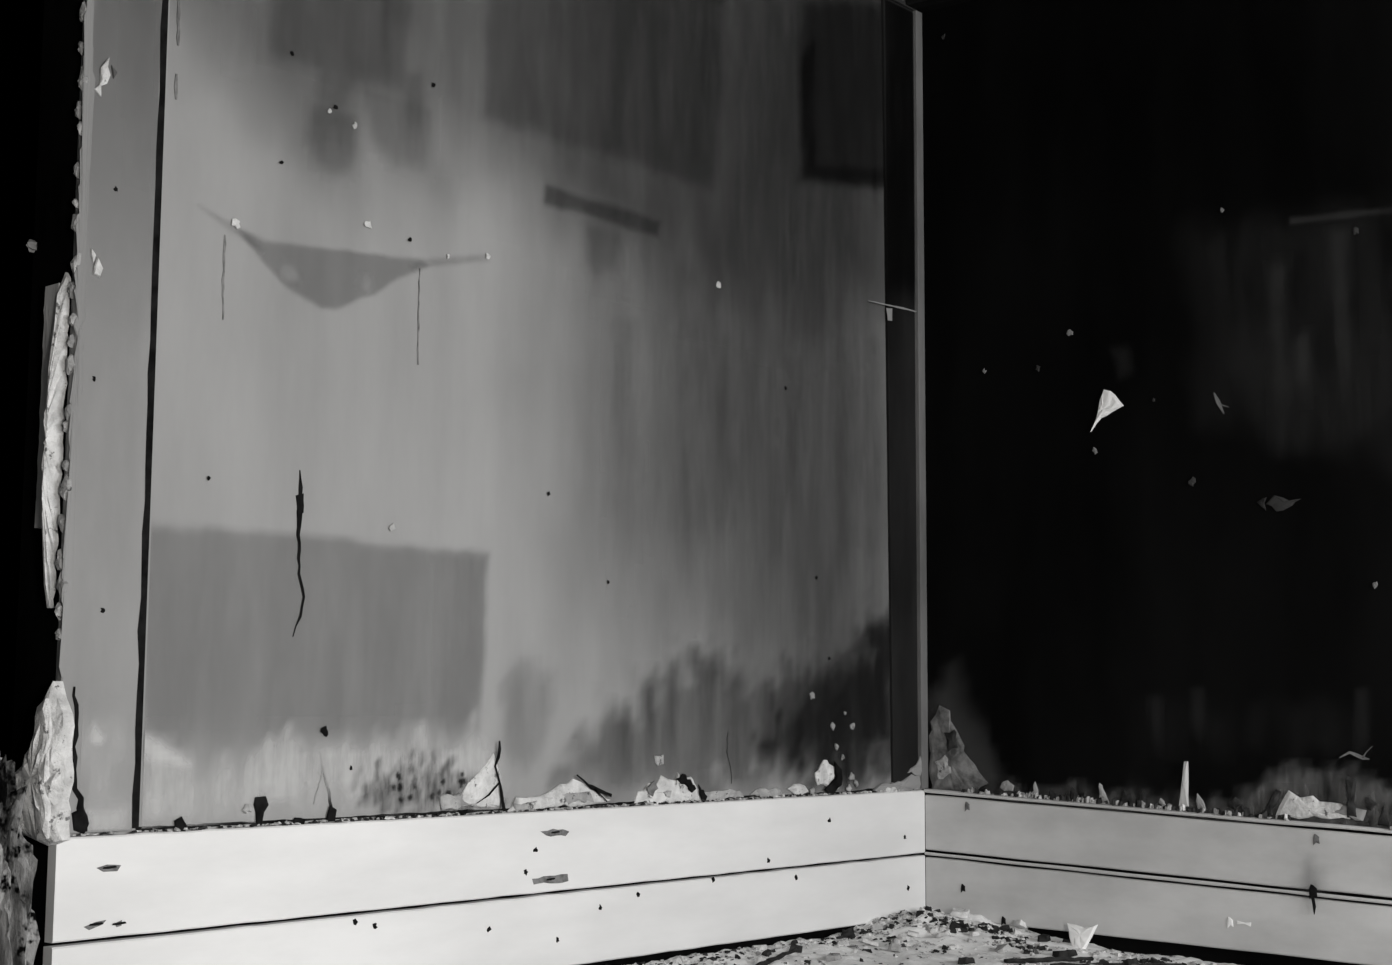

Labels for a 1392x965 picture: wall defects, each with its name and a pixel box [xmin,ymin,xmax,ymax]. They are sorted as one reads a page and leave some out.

flaking render [15,0,117,846]
crack [292,470,305,637]
damp [765,628,892,782]